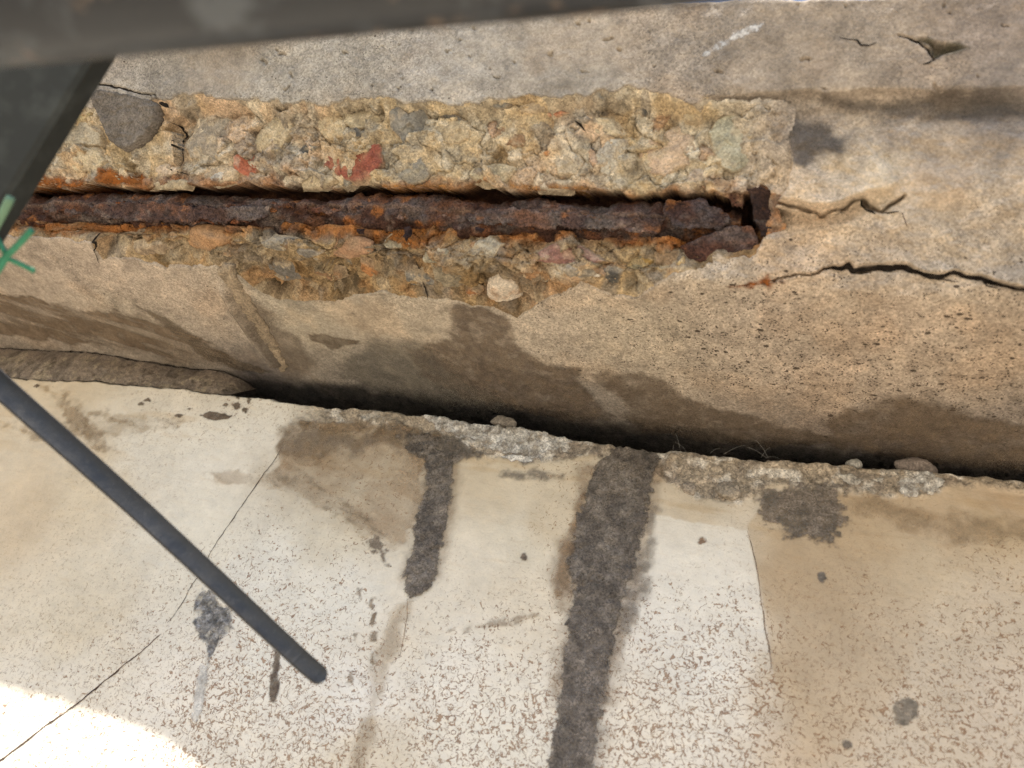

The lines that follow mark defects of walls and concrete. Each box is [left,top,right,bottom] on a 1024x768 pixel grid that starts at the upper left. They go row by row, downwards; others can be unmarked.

spalling [9,85,796,318]
corrosion [381,184,460,199]
crack [860,200,900,214]
corrosion [40,221,144,235]
corrosion [388,228,428,248]
crack [812,262,1024,290]
leakage [0,294,1024,768]